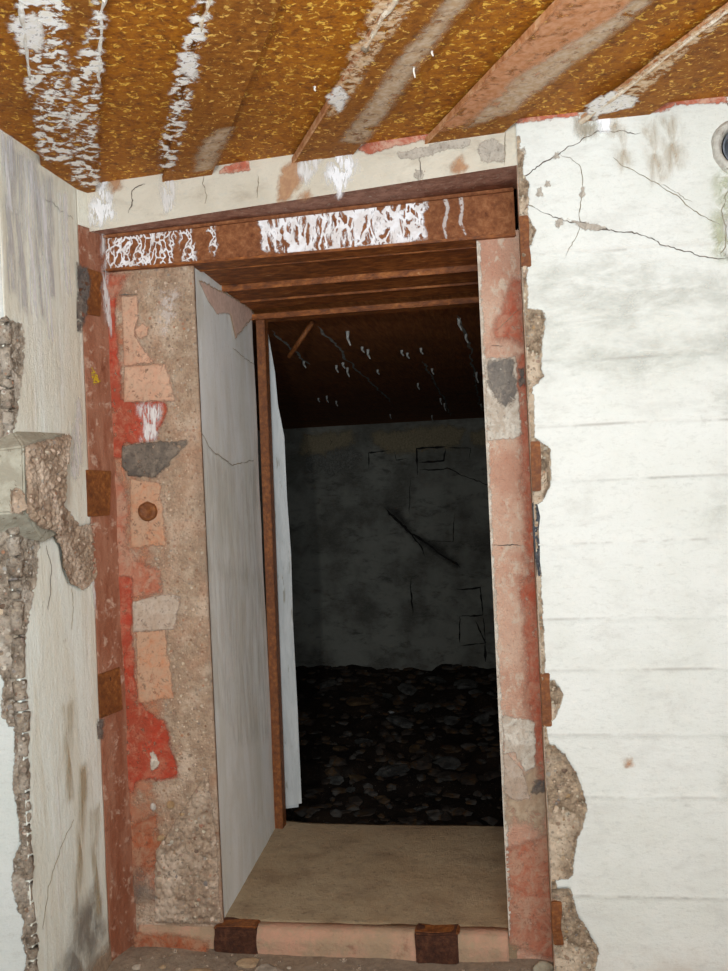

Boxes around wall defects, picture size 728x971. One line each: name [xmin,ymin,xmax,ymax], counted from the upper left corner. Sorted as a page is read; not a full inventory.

water stain [2,0,197,339]
water stain [159,0,213,168]
water stain [196,129,229,171]
corrosion [278,162,309,201]
peeling [358,0,647,180]
crack [504,130,728,259]
spalling [0,315,25,439]
crack [368,446,488,566]
peeling [476,136,599,971]
crack [458,587,487,662]
spalling [0,526,40,971]
corrosion [68,753,86,813]